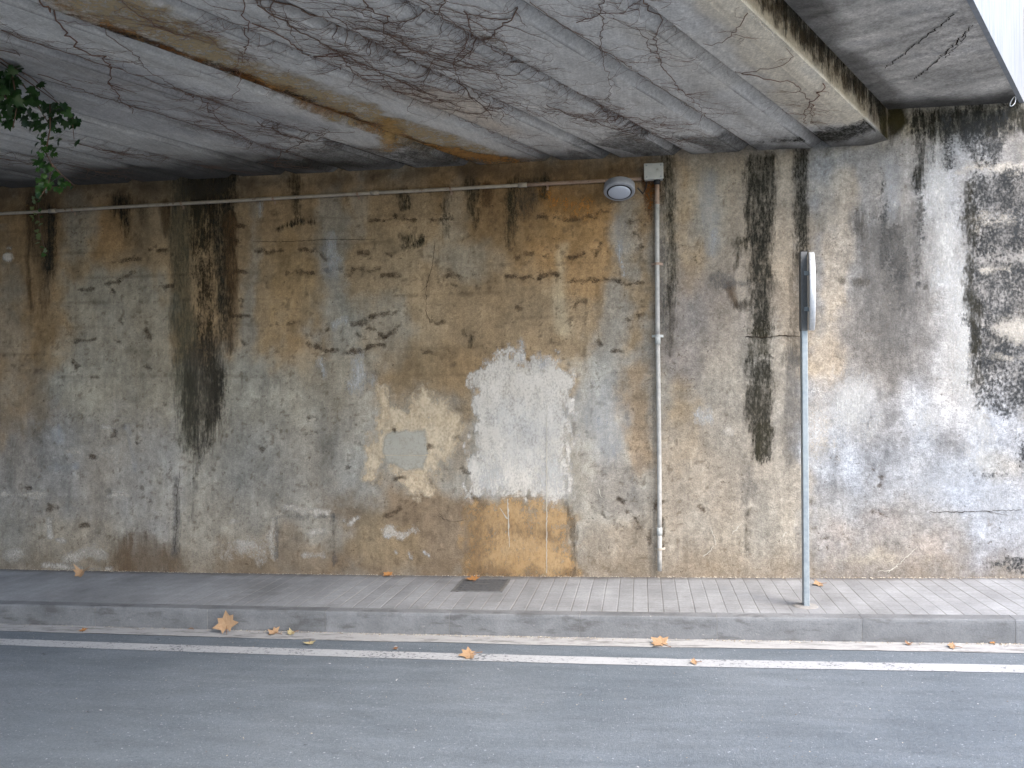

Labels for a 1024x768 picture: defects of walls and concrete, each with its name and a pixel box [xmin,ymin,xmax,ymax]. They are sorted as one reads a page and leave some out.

water stain [26,196,57,291]
water stain [112,193,141,234]
water stain [161,174,237,457]
water stain [262,141,395,231]
water stain [711,154,870,464]
water stain [758,0,886,276]
crack [885,14,973,79]
water stain [860,102,1024,459]